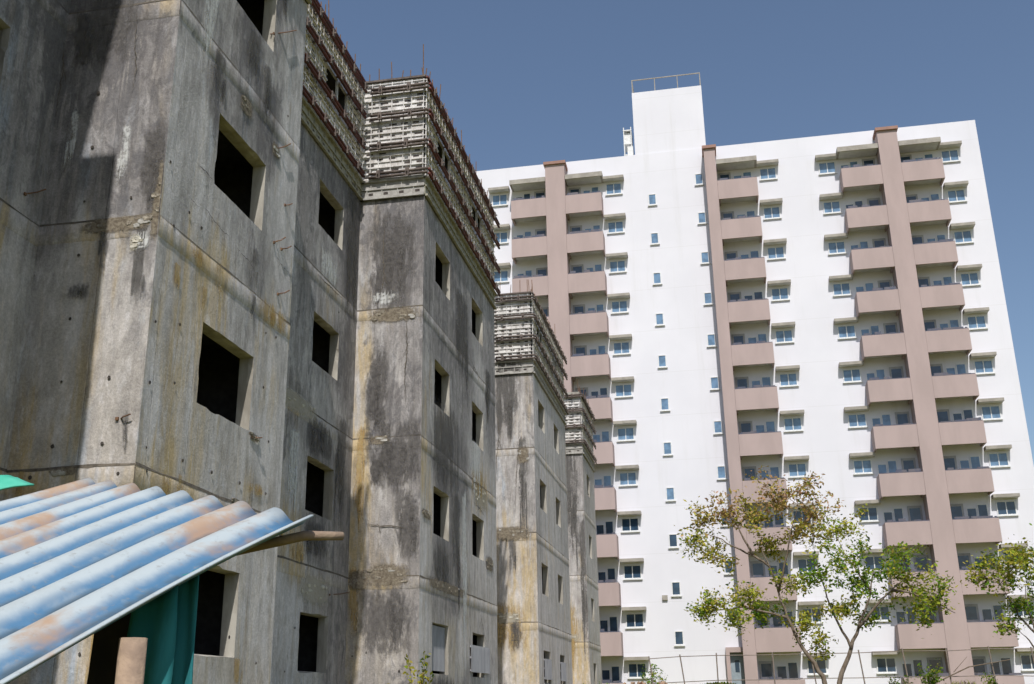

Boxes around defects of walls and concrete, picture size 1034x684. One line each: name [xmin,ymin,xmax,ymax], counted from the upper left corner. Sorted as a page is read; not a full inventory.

leakage [74,0,133,63]
leakage [117,127,130,172]
leakage [141,128,164,208]
spalling [84,163,164,249]
leakage [131,224,148,295]
leakage [486,362,526,450]
leakage [366,348,421,554]
spalling [348,564,408,590]
leakage [434,405,480,661]
leakage [508,540,516,569]
leakage [519,462,527,535]
leakage [364,591,408,650]